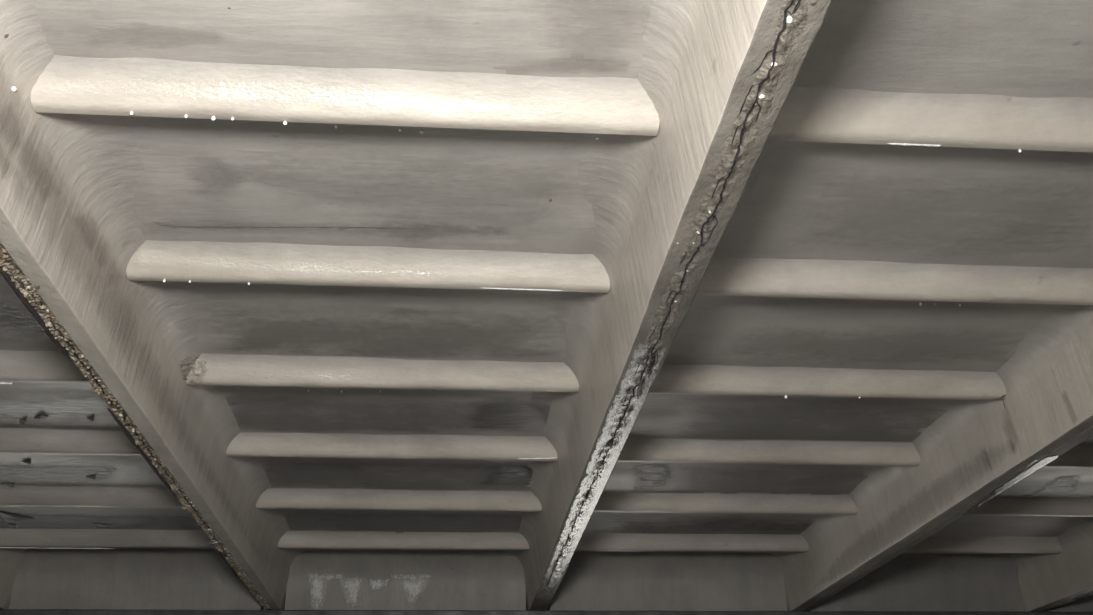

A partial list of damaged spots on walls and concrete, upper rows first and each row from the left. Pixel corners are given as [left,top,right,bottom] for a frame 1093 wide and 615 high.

spalling [0,242,271,610]
crack [541,0,818,596]